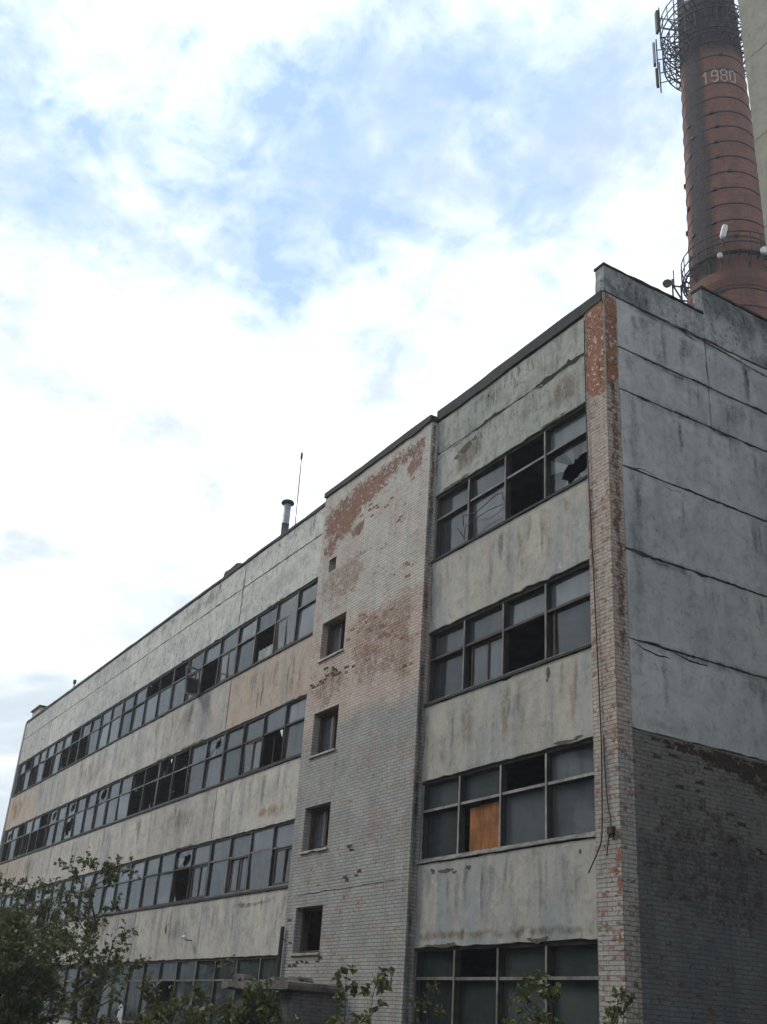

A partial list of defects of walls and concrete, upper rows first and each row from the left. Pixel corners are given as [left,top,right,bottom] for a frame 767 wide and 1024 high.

crack [453,353,584,448]
peeling [324,425,436,556]
peeling [585,295,626,654]
crack [625,465,767,522]
crack [631,549,767,597]
peeling [285,599,413,704]
crack [632,638,767,679]
spalling [651,737,767,797]